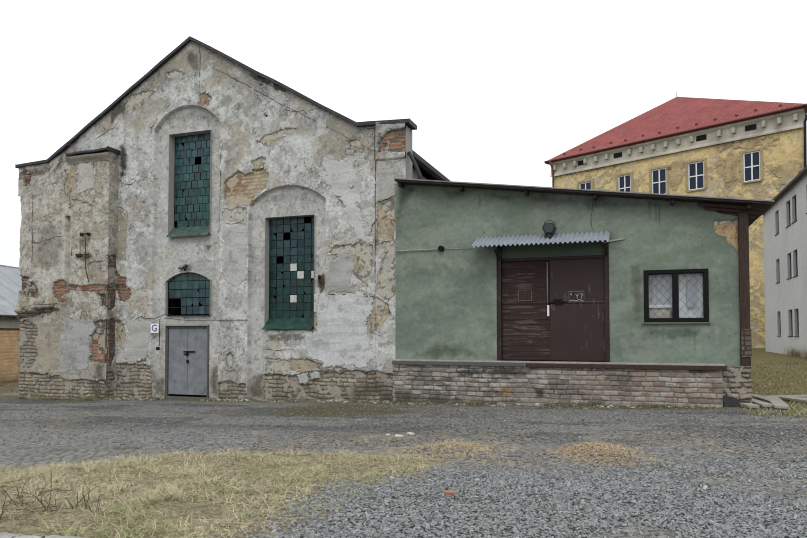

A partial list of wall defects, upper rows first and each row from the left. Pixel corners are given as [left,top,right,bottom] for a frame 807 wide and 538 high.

flaking render [197,90,211,106]
crack [199,49,392,264]
flaking render [378,128,406,154]
flaking render [223,157,268,224]
flaking render [714,219,738,252]
flaking render [328,183,396,332]
flaking render [19,255,153,399]
flaking render [219,381,248,400]
flaking render [263,358,393,401]